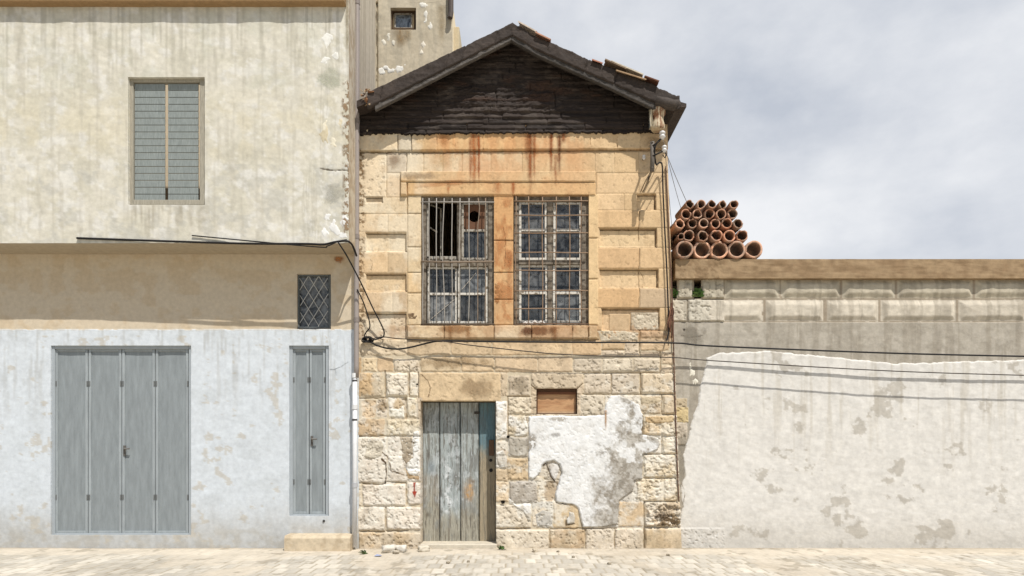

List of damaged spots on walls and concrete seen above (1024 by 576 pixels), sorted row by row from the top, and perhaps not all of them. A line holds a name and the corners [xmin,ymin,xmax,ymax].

peeling [378,64,405,74]
flaking render [319,82,364,336]
corrosion [470,134,480,175]
flaking render [496,395,660,527]